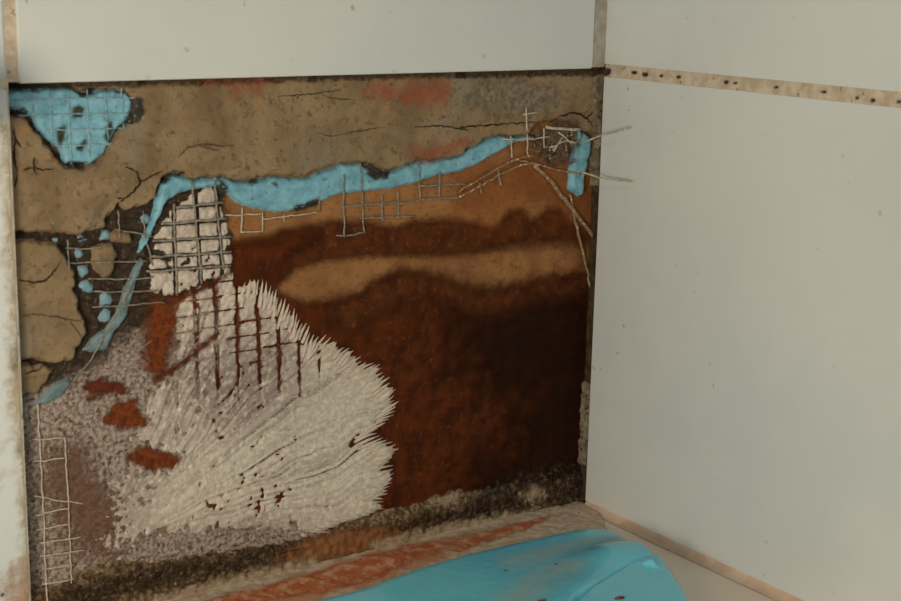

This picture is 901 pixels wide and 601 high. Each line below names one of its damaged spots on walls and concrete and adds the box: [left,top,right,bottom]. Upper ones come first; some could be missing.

crack [12,129,55,188]
damp [9,113,61,162]
peeling [8,86,131,165]
crack [116,143,234,205]
spalling [530,120,582,168]
crack [19,226,107,284]
peeling [74,235,113,322]
rust [82,376,148,430]
damp [2,156,590,601]
rust [126,442,186,474]
rust [210,516,549,601]